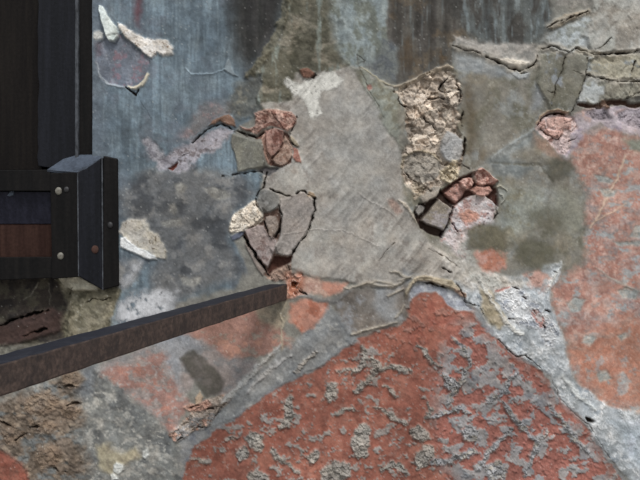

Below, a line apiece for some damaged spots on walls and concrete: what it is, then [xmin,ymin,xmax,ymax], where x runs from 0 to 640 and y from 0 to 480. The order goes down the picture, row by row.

flaking render [92,5,173,120]
crack [451,9,640,129]
flaking render [119,219,168,260]
flaking render [141,101,317,298]
flaking render [405,275,485,315]
flaking render [387,64,508,262]
damp [459,224,504,259]
flaking render [495,285,559,349]
flaking render [535,108,579,156]
flaking render [168,310,293,442]